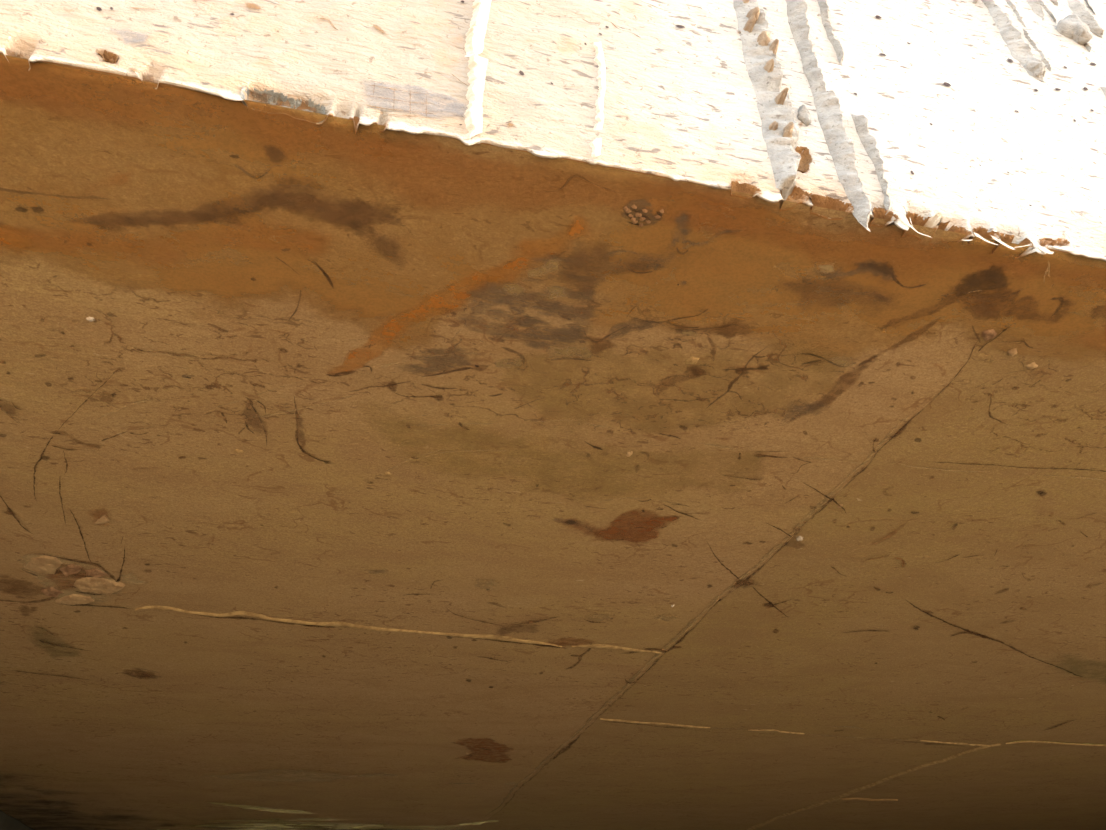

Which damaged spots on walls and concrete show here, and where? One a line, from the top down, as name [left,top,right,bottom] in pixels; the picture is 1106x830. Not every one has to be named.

spalling [240,85,326,122]
spalling [795,146,813,173]
leakage [0,55,524,349]
spalling [779,186,854,212]
spalling [870,207,1079,254]
leakage [549,177,1106,355]
crack [354,298,855,450]
leakage [787,356,876,419]
crack [891,421,911,438]
corrosion [595,499,678,541]
crack [510,463,846,800]
crack [874,587,1084,682]